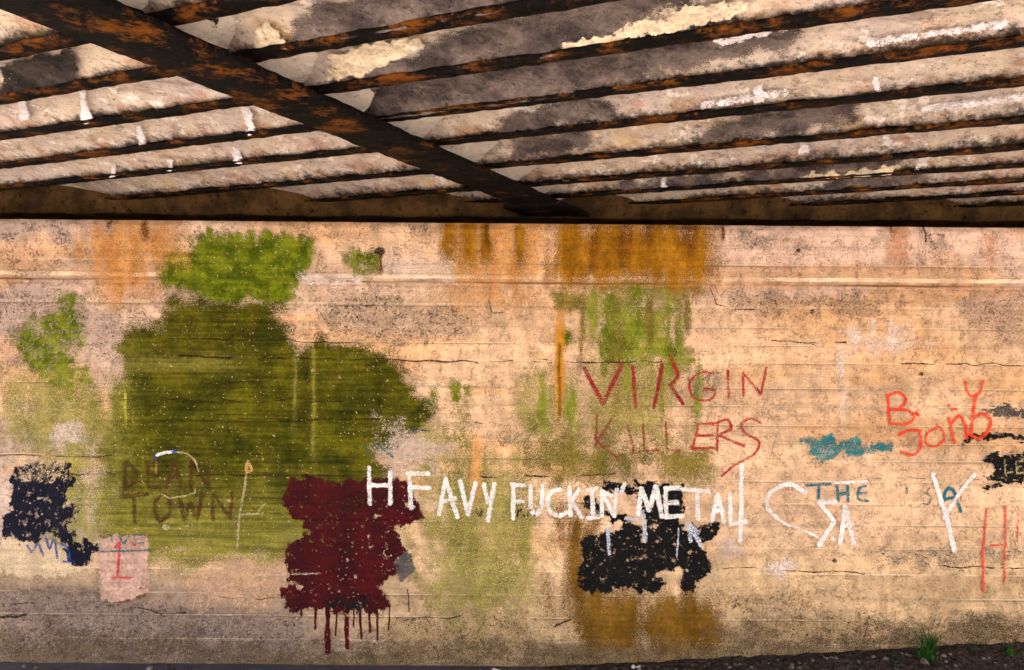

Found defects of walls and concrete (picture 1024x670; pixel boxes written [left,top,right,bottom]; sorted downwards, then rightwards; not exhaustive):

corrosion [72,220,193,318]
damp [260,228,363,299]
corrosion [423,223,725,438]
damp [577,283,704,434]
damp [0,555,1024,667]